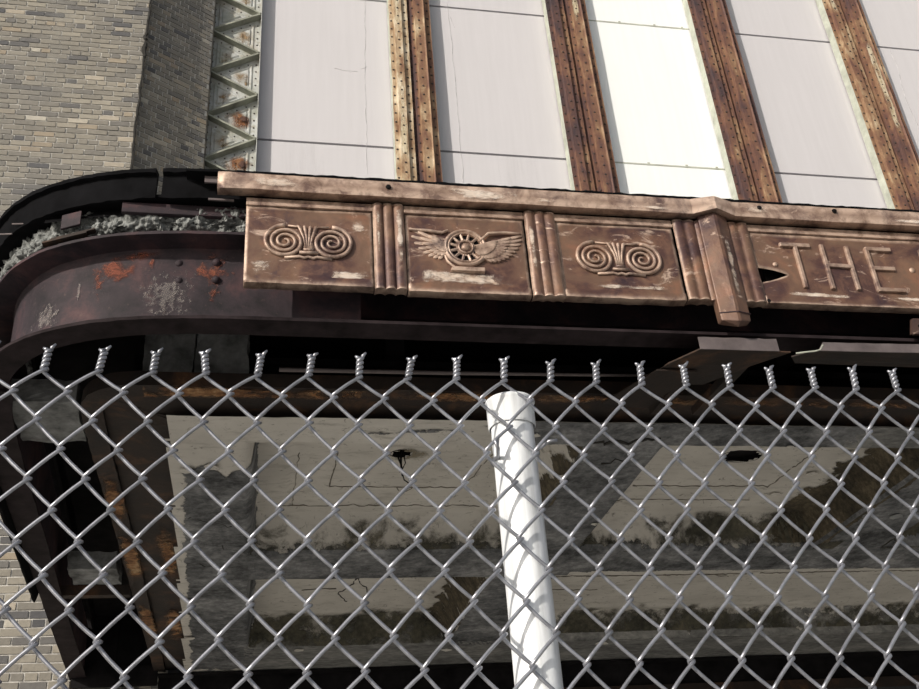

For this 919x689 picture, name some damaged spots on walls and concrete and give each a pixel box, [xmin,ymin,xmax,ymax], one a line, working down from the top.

corrosion [233,112,248,128]
spalling [0,205,246,280]
corrosion [96,252,154,288]
crack [283,453,307,506]
crack [329,453,493,507]
corrosion [118,537,140,576]
corrosion [159,537,177,573]
leakage [582,533,615,552]
leakage [635,512,843,549]
leakage [881,522,919,548]
leakage [559,605,794,641]
leakage [816,603,919,634]